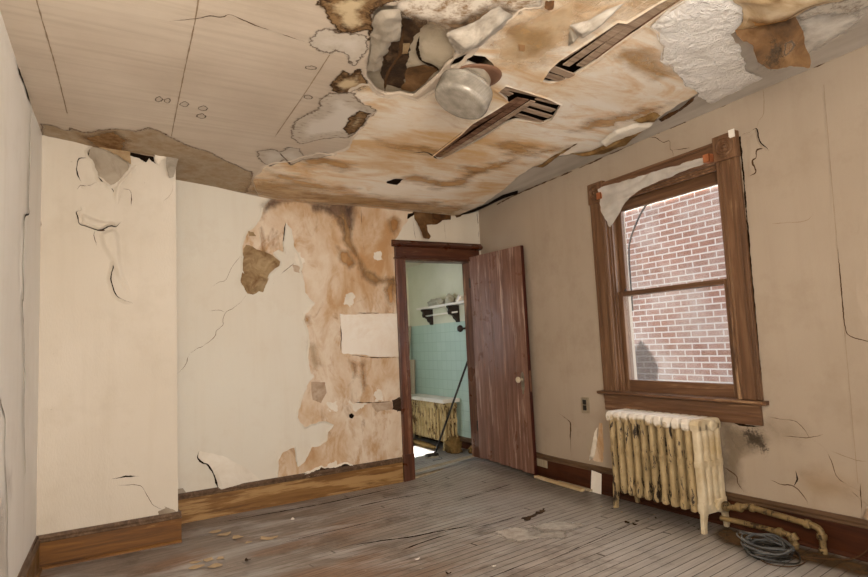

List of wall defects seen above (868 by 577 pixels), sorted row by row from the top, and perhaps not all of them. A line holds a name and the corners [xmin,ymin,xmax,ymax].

crack [16,62,32,393]
peeling [76,146,155,206]
peeling [240,0,762,477]
crack [739,92,769,379]
water stain [726,430,767,479]
crack [735,417,867,512]